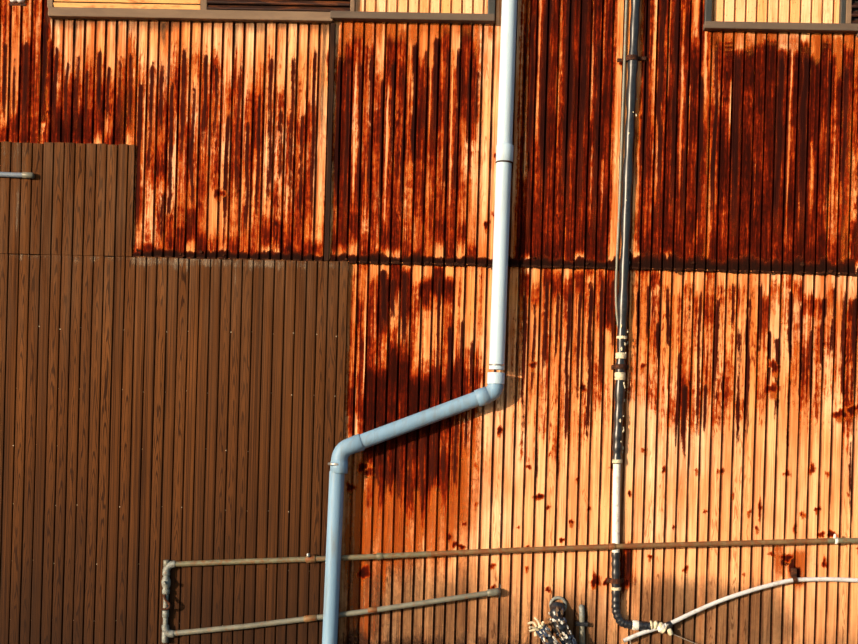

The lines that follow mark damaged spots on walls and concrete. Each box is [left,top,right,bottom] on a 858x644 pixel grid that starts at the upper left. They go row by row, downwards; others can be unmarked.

corrosion [0,0,494,437]
corrosion [507,0,858,505]
corrosion [344,407,484,639]
corrosion [747,496,762,534]
corrosion [590,571,609,590]
corrosion [620,540,637,600]
corrosion [769,545,805,588]